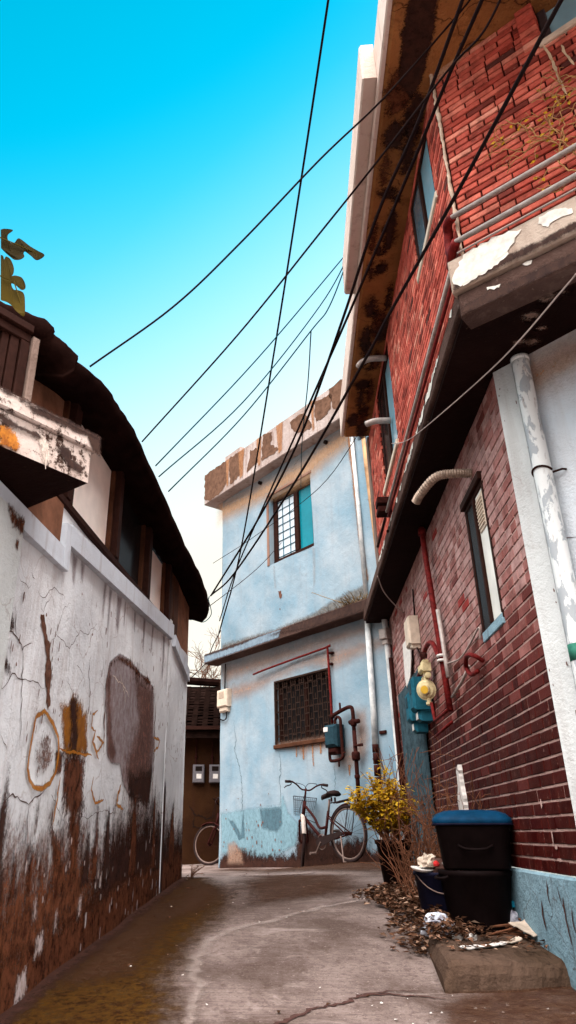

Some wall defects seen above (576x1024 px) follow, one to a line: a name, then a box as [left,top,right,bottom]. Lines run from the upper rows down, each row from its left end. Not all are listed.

peeling [538,208,573,227]
peeling [452,229,521,286]
leakage [221,68,424,536]
corrosion [0,425,21,450]
peeling [1,415,83,472]
peeling [0,385,101,456]
peeling [204,379,342,501]
crack [1,568,104,748]
crack [1,787,113,834]
corrosion [50,694,88,880]
leakage [0,671,183,1014]
crack [273,990,446,1024]